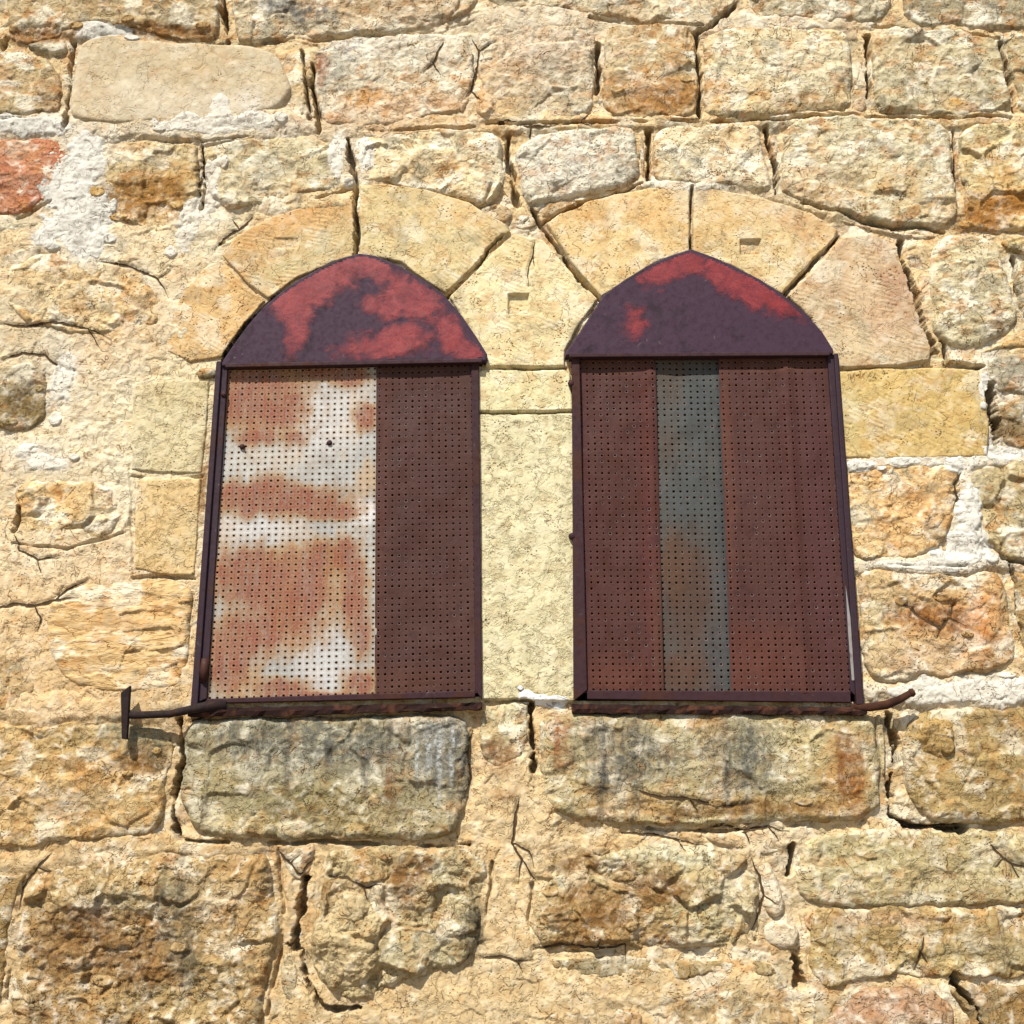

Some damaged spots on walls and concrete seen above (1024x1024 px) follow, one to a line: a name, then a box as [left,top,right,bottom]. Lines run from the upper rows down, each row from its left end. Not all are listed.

crack [100,261,171,298]
corrosion [226,368,370,446]
corrosion [352,402,376,434]
corrosion [219,474,362,521]
corrosion [209,535,375,697]
crack [511,800,536,884]